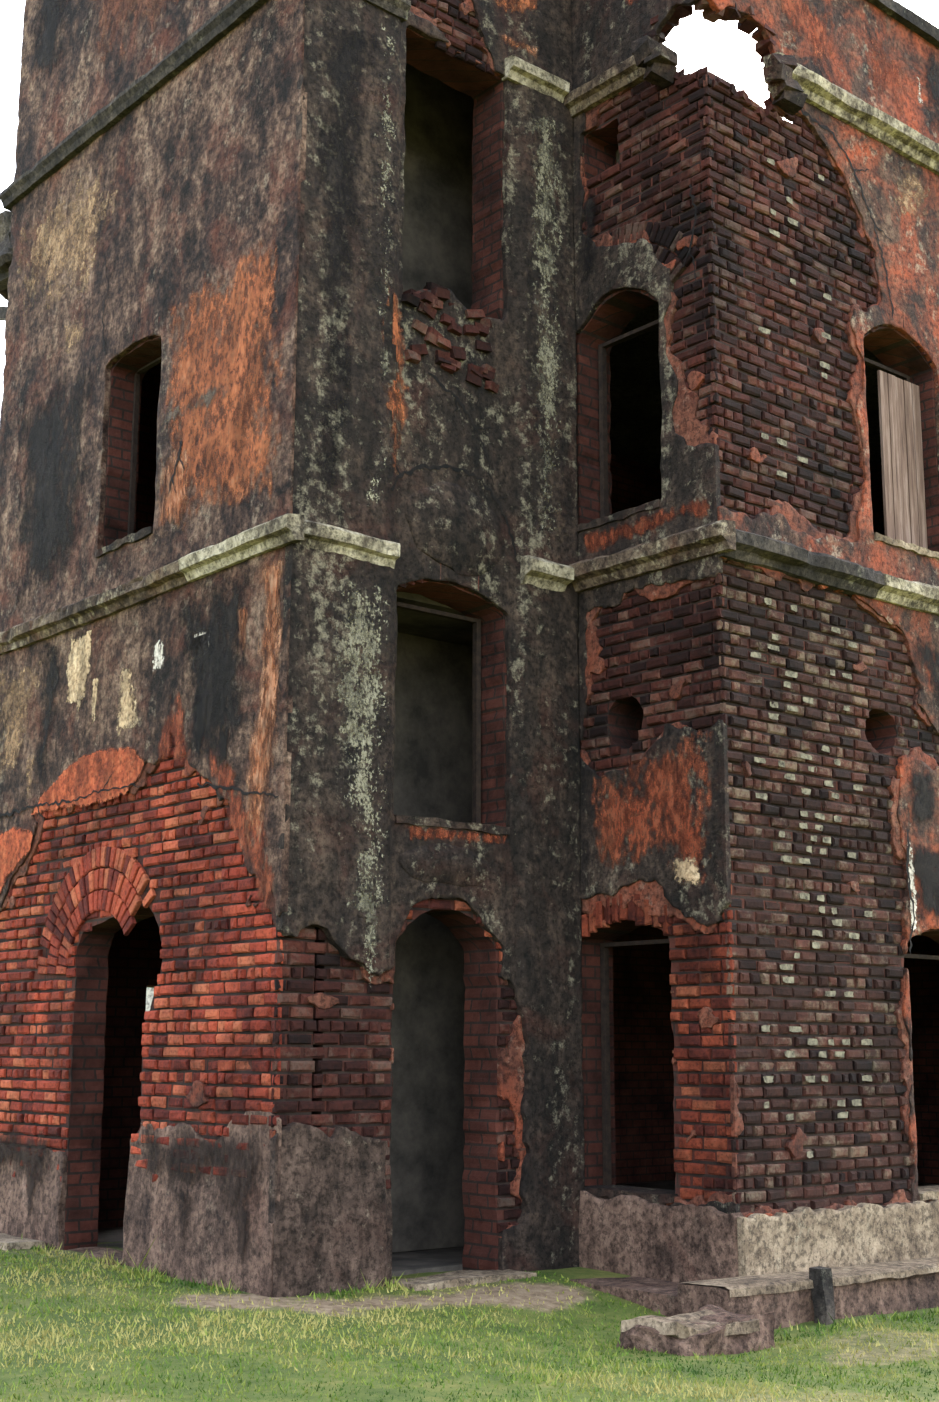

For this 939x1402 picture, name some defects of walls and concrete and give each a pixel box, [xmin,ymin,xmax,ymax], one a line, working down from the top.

water stain [34,0,69,75]
spalling [410,0,501,80]
peeling [498,0,536,11]
spalling [582,0,880,538]
spalling [581,558,939,1213]